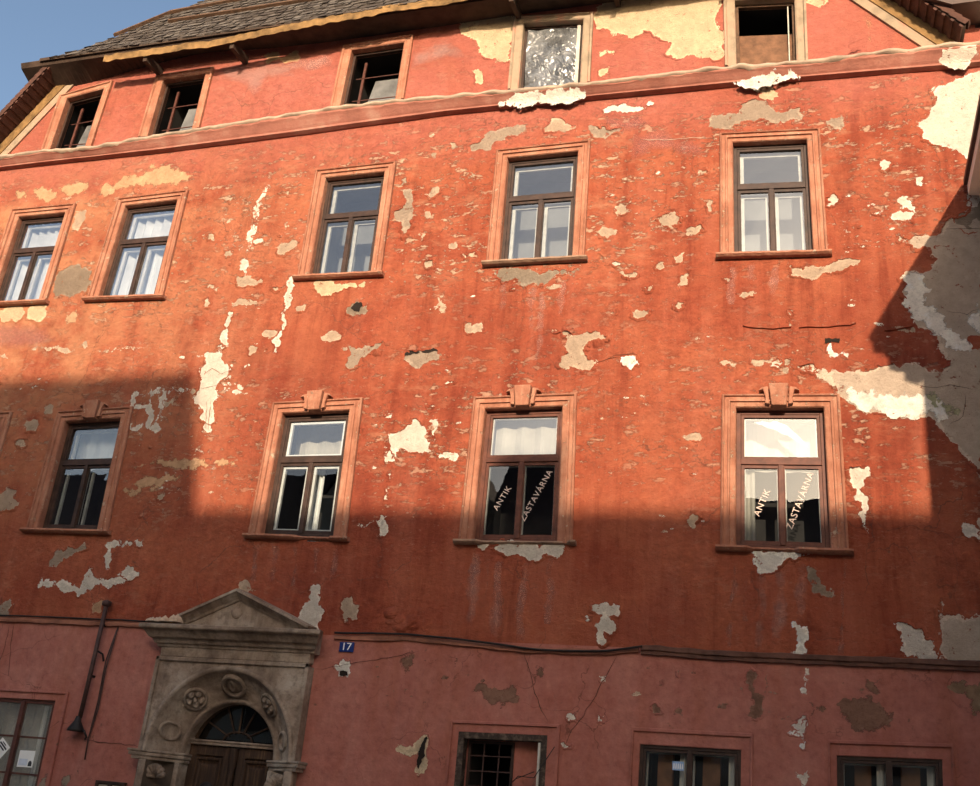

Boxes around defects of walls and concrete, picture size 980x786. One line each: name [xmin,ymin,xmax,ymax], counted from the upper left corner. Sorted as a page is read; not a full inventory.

spalling [593,0,725,63]
spalling [498,87,654,140]
spalling [917,45,980,159]
spalling [130,185,310,449]
spalling [313,280,366,298]
spalling [552,326,612,375]
spalling [716,177,980,482]
spalling [372,403,459,501]
spalling [844,462,872,535]
spalling [38,538,145,615]
spalling [752,551,835,598]
spalling [894,596,980,660]